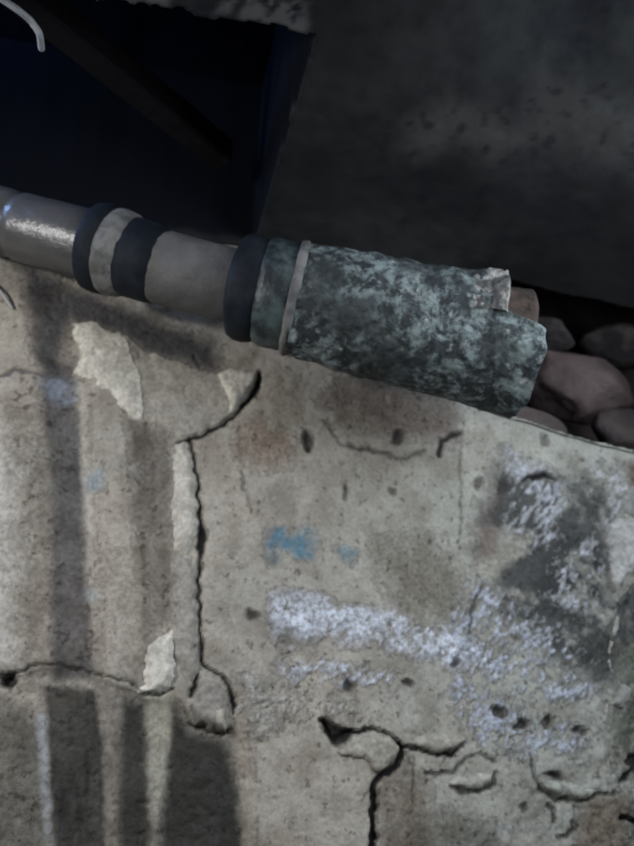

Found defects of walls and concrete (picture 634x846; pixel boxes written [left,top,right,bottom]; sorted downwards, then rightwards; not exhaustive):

crack [0,365,72,381]
crack [522,469,559,483]
crack [0,368,263,738]
water stain [0,258,634,846]
crack [318,717,499,846]
crack [527,751,634,841]